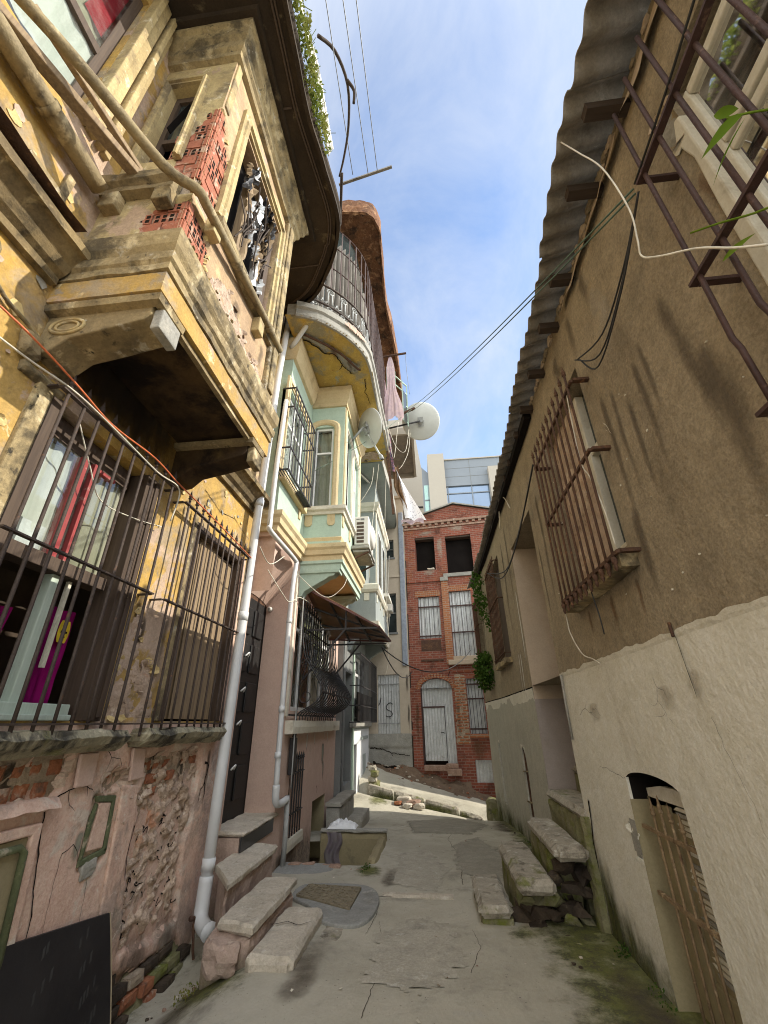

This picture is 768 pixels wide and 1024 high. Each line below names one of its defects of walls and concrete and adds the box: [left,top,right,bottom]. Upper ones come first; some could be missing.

crack [303,339,370,403]
spalling [0,753,78,805]
crack [26,786,94,938]
spalling [86,745,198,951]
leakage [601,873,660,989]